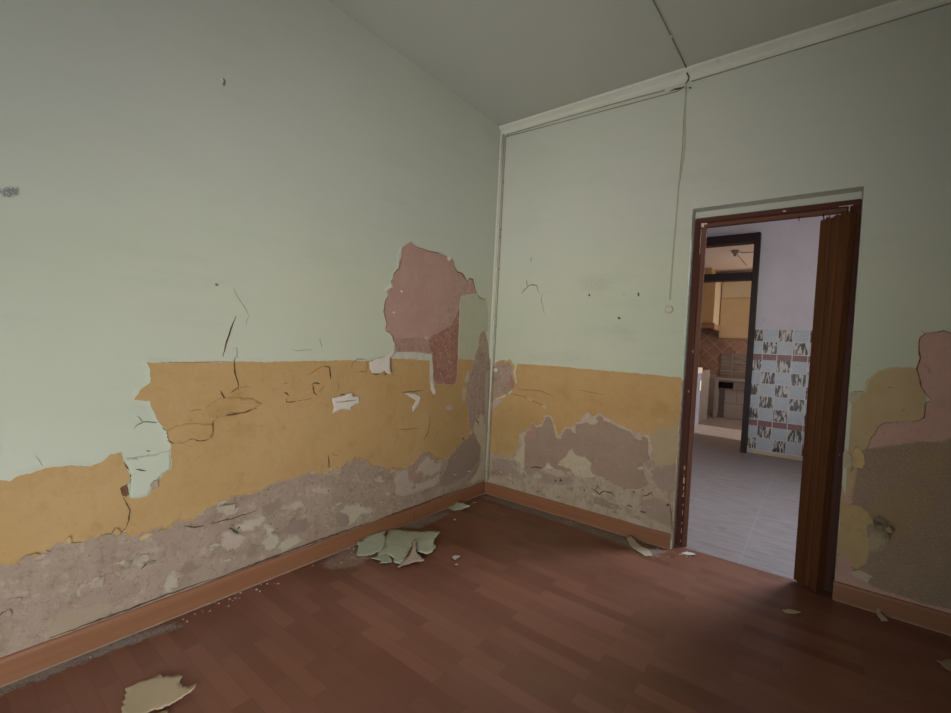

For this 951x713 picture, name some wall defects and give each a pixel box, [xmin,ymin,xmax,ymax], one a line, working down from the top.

crack [134,288,257,447]
crack [50,489,459,638]
peeling [0,239,695,658]
flaking render [835,330,951,614]